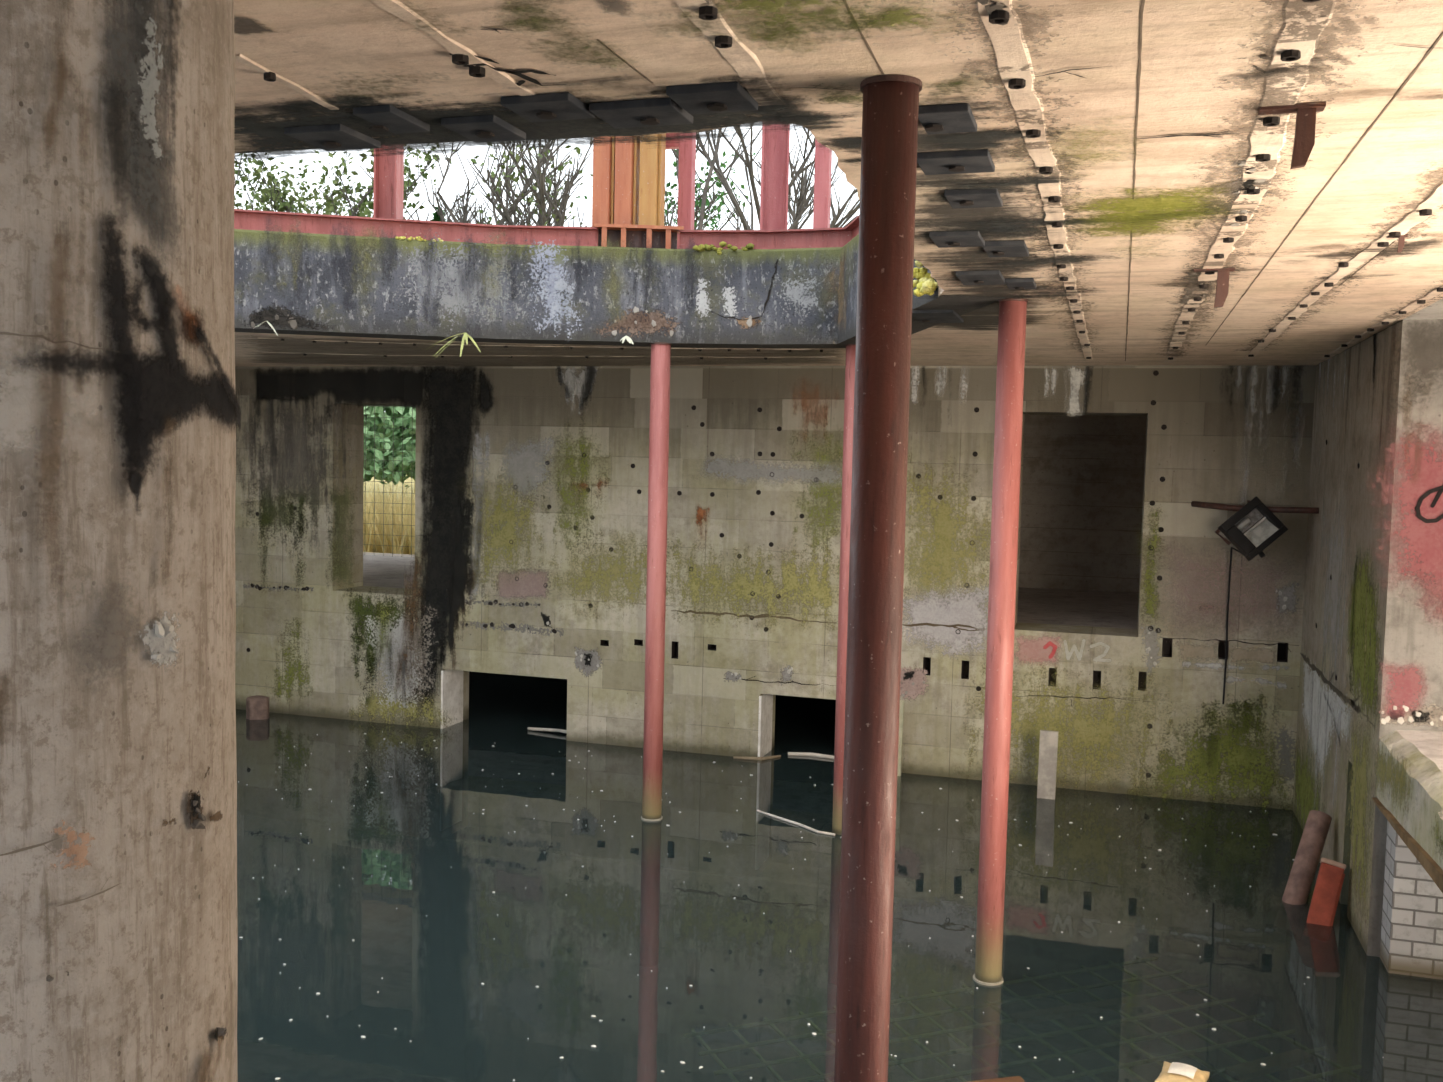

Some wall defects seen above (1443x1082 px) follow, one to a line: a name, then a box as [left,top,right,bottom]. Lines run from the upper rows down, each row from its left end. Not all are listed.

leakage [45,54,89,155]
leakage [103,0,179,248]
leakage [914,99,1098,331]
leakage [670,347,836,365]
leakage [238,337,651,719]